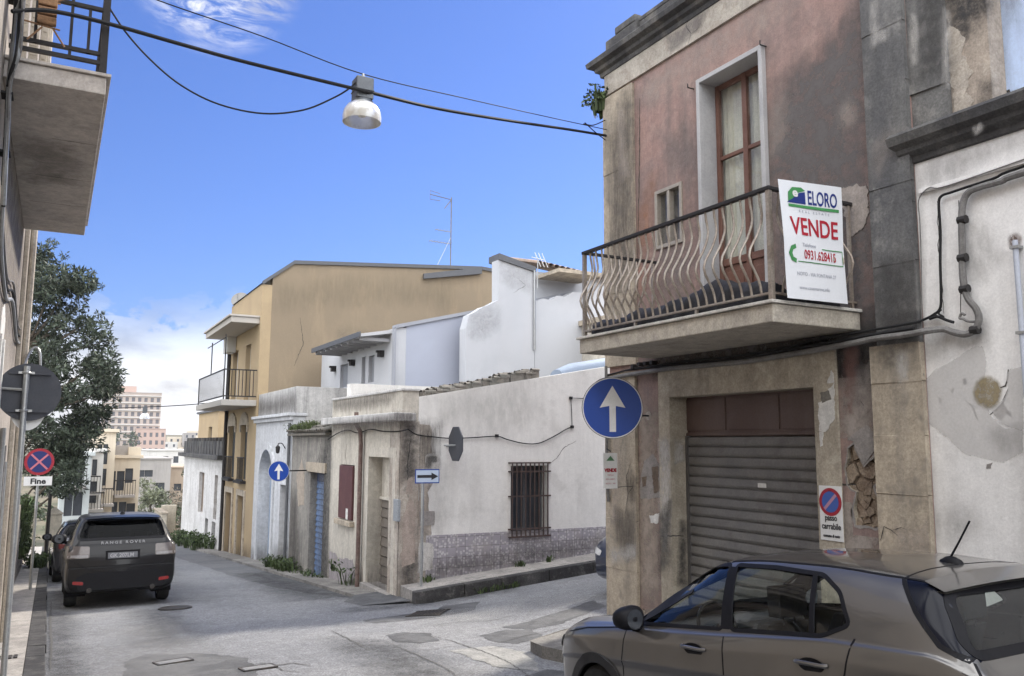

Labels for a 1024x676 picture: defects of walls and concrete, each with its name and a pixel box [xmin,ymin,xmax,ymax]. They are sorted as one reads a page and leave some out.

flaking render [818,354,879,549]
leakage [974,377,1001,407]